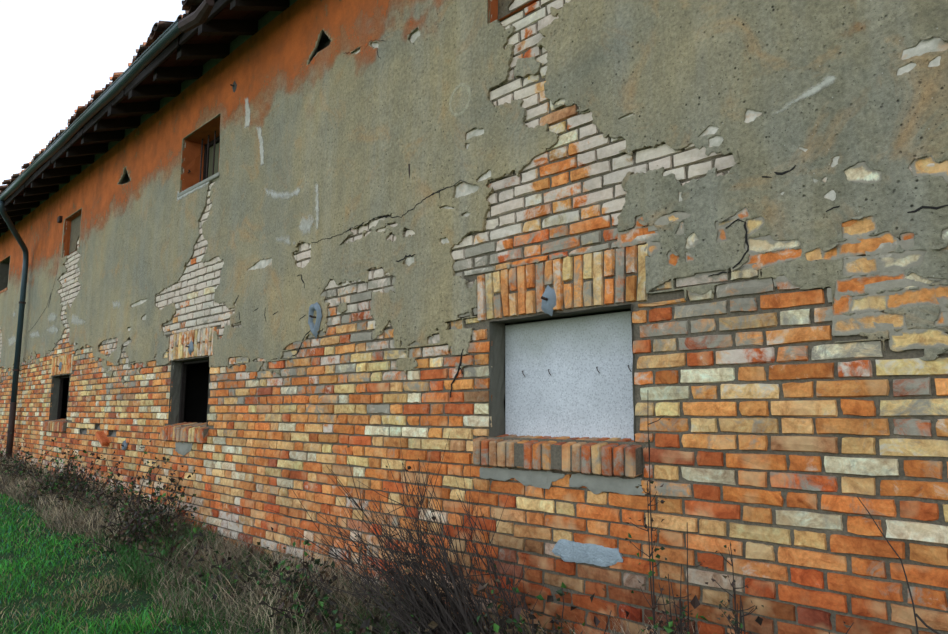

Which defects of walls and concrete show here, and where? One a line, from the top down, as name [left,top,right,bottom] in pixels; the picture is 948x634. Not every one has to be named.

spalling [896,35,948,76]
peeling [0,0,390,376]
spalling [339,216,415,245]
crack [312,180,473,243]
spalling [441,0,740,288]
spalling [744,109,762,123]
flaking render [813,156,882,201]
flaking render [910,155,948,196]
flaking render [715,207,948,352]
spalling [292,267,407,394]